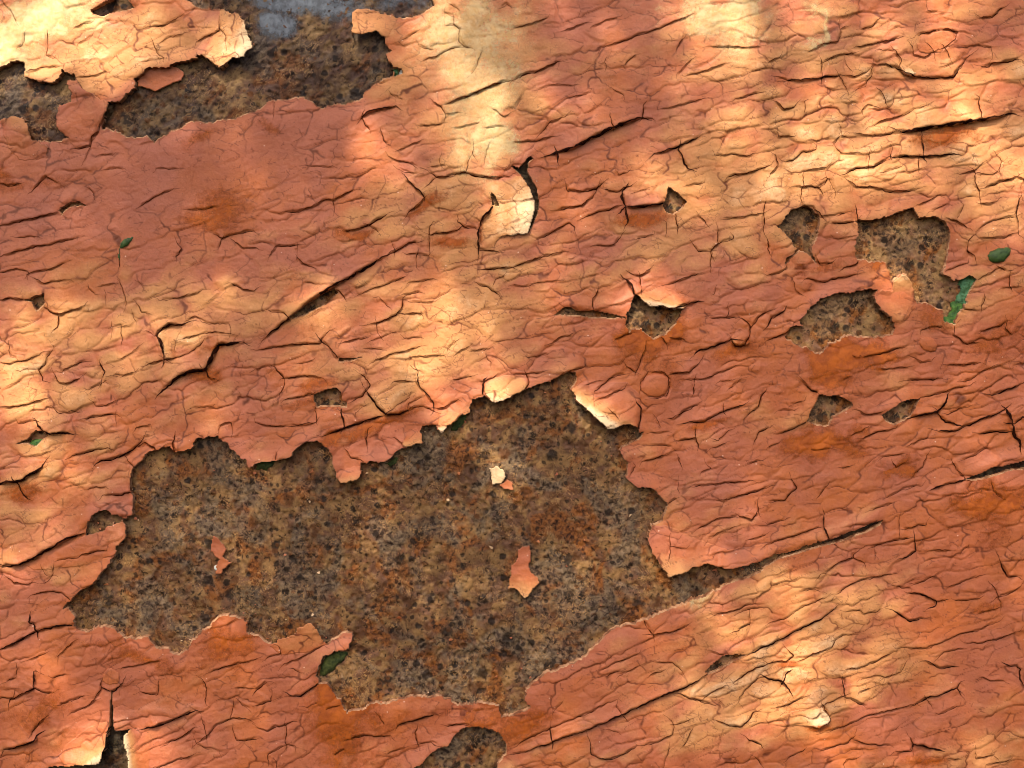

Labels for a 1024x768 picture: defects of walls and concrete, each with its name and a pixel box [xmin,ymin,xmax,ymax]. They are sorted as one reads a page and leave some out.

peeling [0,0,435,161]
crack [0,3,770,461]
peeling [556,282,690,340]
crack [599,4,1024,345]
peeling [785,207,977,355]
rust [320,407,416,447]
peeling [21,371,883,718]
crack [510,303,1024,768]
crack [0,533,164,756]
peeling [48,691,151,768]
rust [312,684,383,768]
rust [452,706,551,740]